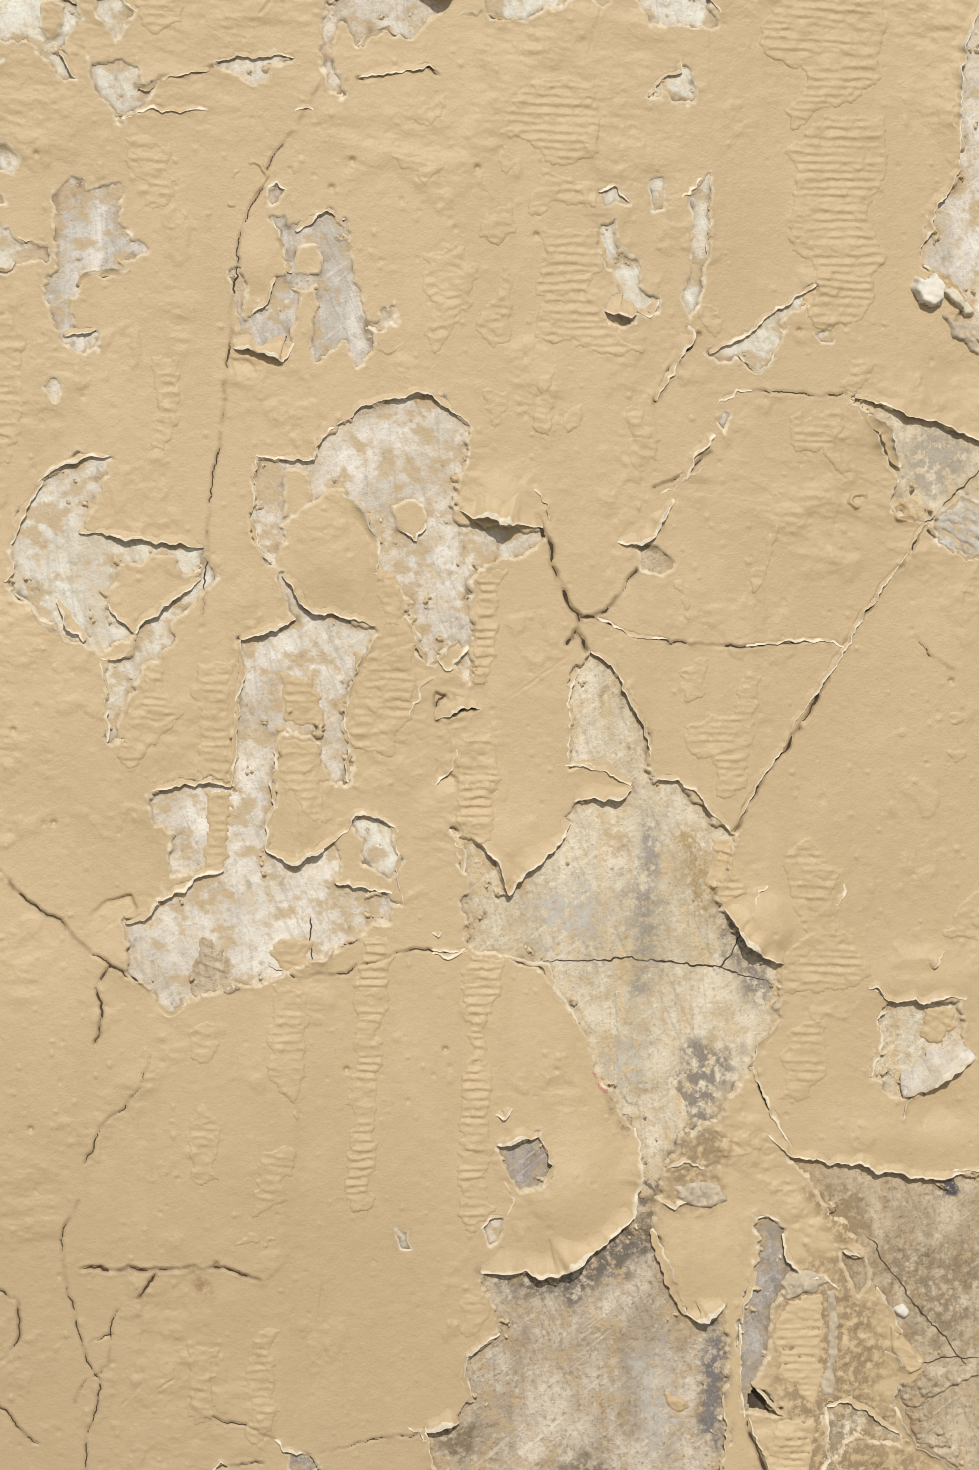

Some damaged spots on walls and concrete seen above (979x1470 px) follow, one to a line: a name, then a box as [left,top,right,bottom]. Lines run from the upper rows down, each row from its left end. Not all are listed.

peeling [911,2,979,355]
peeling [229,180,406,367]
crack [654,388,843,494]
peeling [853,393,979,561]
peeling [3,452,215,743]
peeling [122,386,553,1016]
crack [539,527,686,649]
crack [723,470,979,832]
crack [19,893,66,926]
crack [93,954,141,1042]
peeling [408,651,979,1470]
crack [66,1288,117,1467]